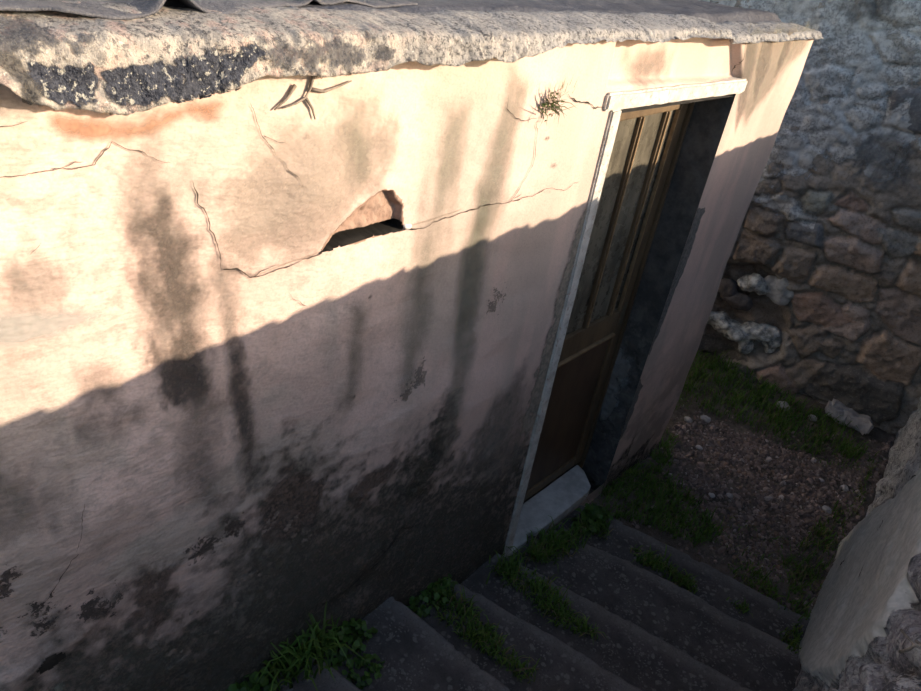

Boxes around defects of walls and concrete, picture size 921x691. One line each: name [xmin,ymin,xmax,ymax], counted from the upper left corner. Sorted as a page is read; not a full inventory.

crack [0,142,170,178]
crack [251,106,307,189]
crack [400,104,567,231]
crack [193,183,322,278]
hole [320,189,412,253]
leakage [134,198,209,482]
leakage [232,347,251,440]
leakage [24,372,530,691]
peeling [0,566,23,601]
peeling [17,589,123,637]
hole [36,652,66,674]